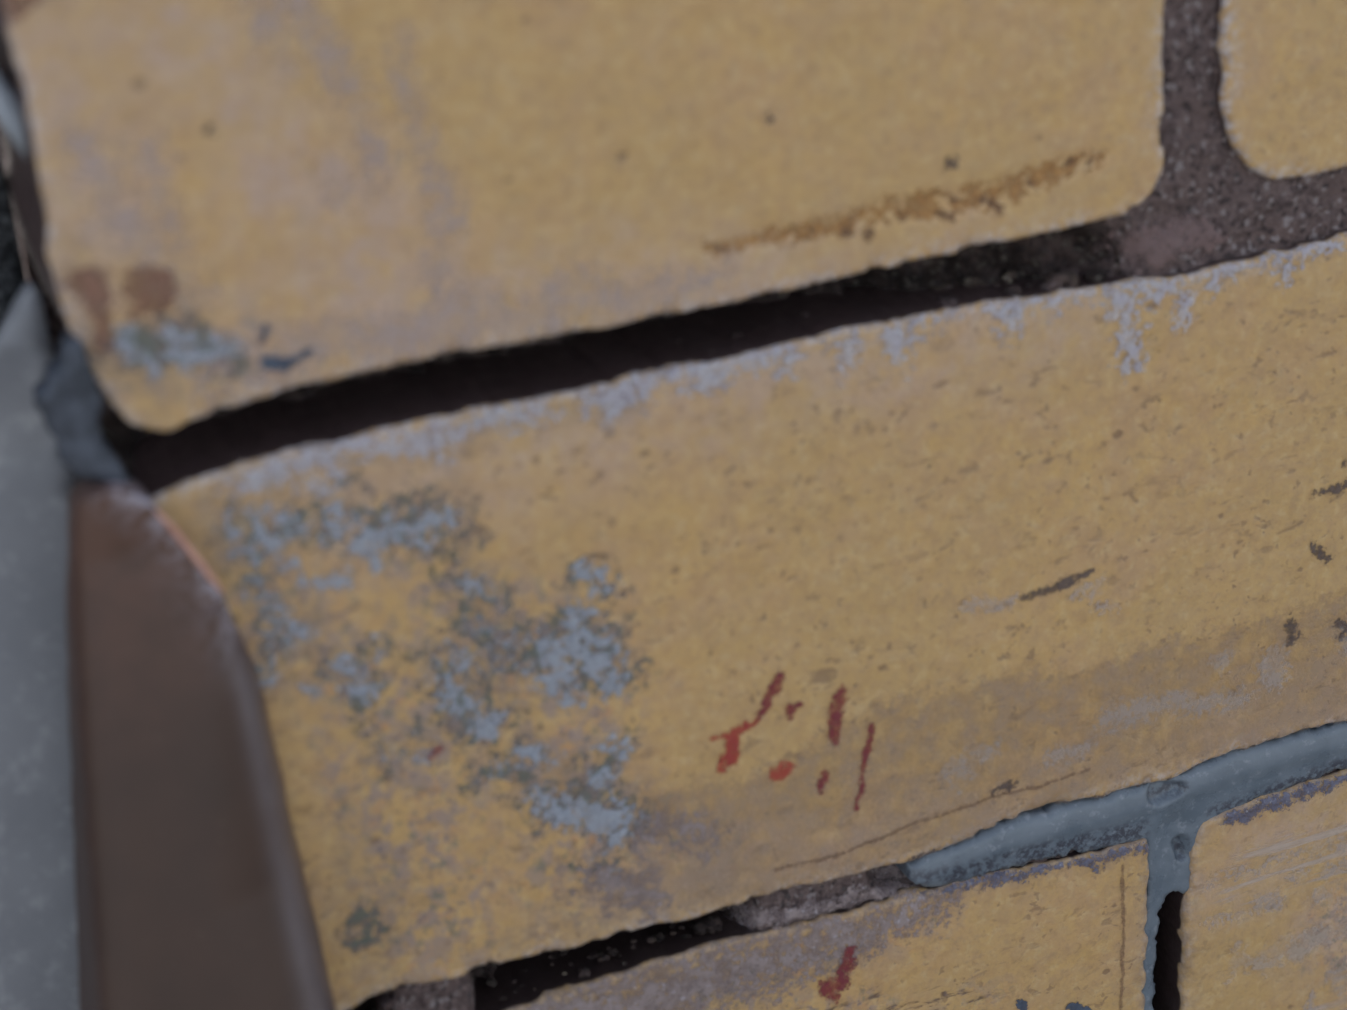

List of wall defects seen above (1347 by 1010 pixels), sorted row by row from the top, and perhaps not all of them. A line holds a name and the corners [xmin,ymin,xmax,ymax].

peeling [257,323,314,373]
peeling [291,554,657,877]